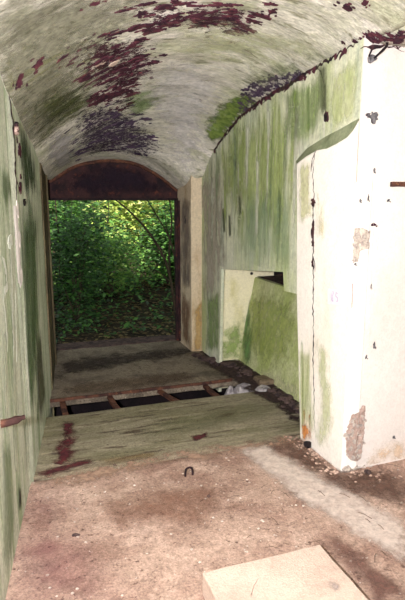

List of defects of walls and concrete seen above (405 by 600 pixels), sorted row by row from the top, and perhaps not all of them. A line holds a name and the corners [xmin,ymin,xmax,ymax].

peeling [341,29,405,45]
peeling [56,0,278,161]
peeling [233,69,303,112]
crack [214,42,404,153]
leakage [256,111,272,235]
leakage [202,128,249,295]
spalling [352,223,378,266]
leakage [202,351,300,422]
spalling [342,406,372,473]